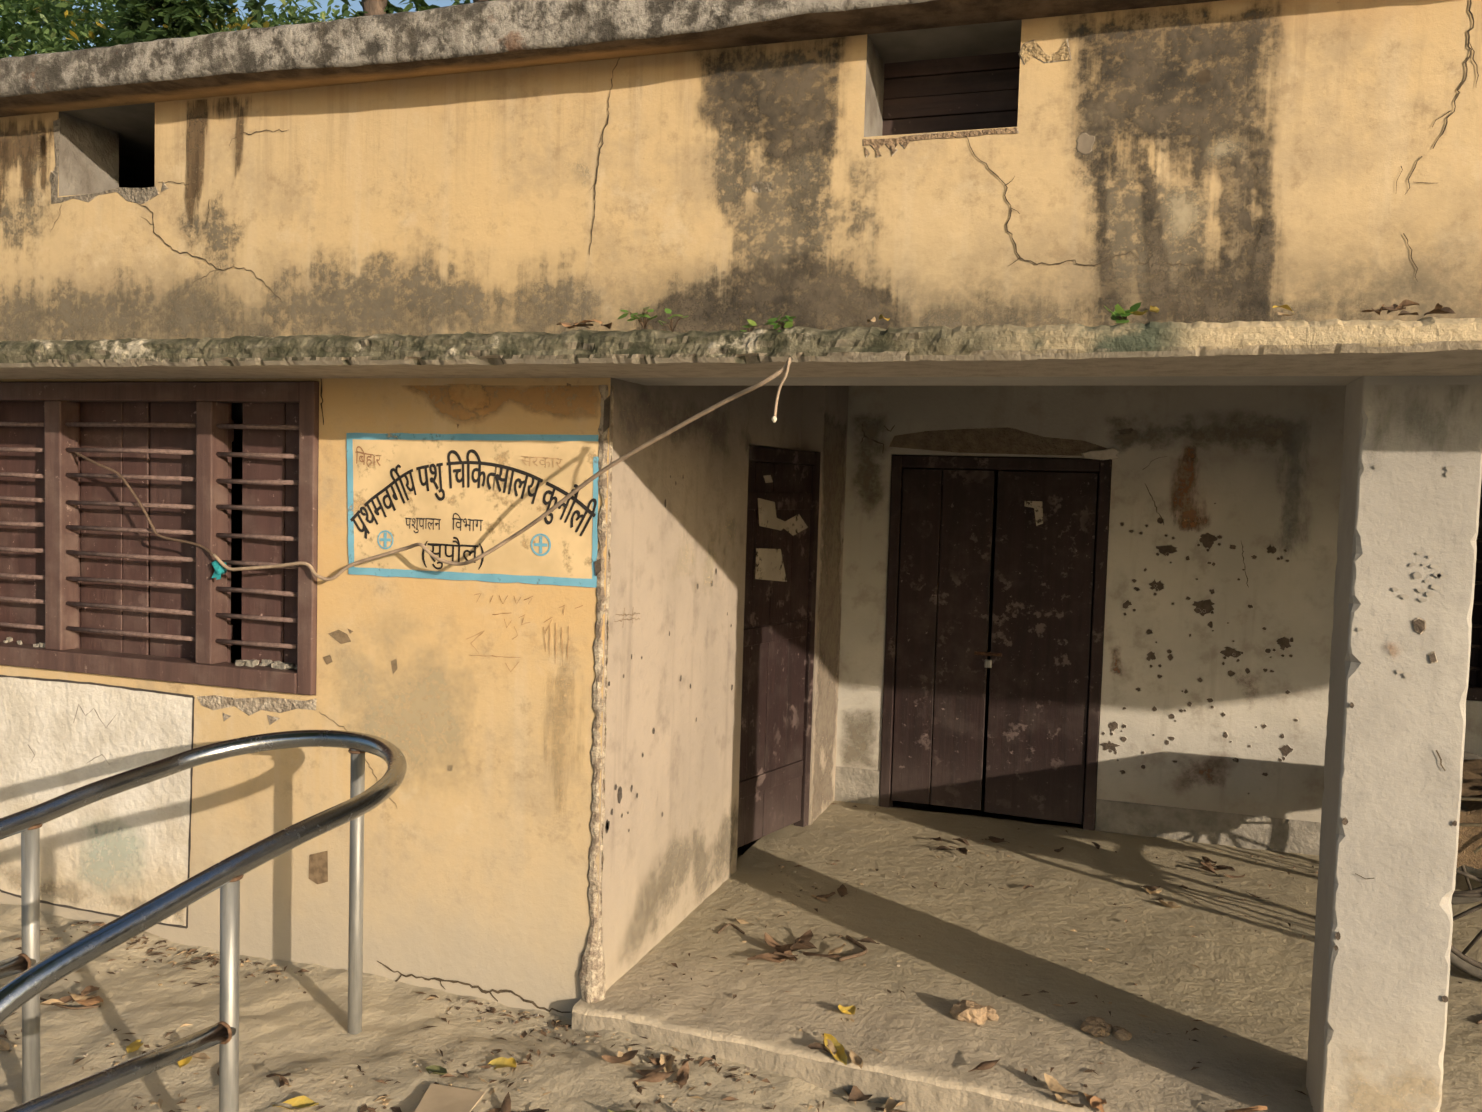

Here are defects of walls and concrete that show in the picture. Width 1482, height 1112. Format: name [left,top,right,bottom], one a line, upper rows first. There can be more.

leakage [0,120,52,248]
leakage [181,98,244,260]
crack [589,58,620,255]
leakage [638,36,899,333]
crack [964,135,1192,266]
leakage [922,4,1301,328]
crack [1396,0,1479,193]
flaking render [888,427,1133,460]
corrosion [1172,447,1209,529]
flaking render [1120,517,1294,679]
flaking render [578,385,638,1003]
flaking render [1098,677,1299,777]